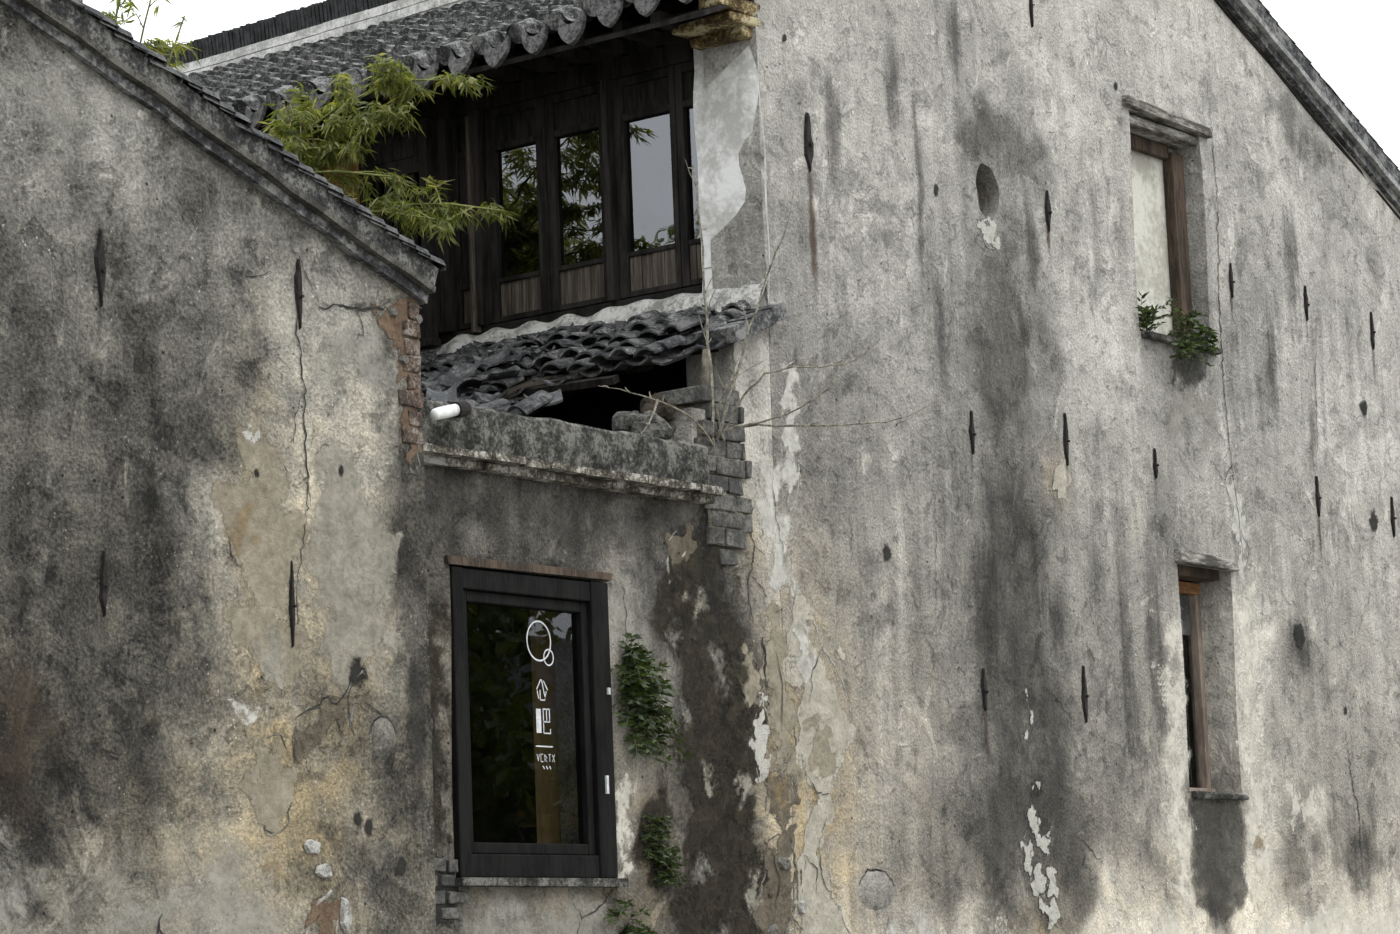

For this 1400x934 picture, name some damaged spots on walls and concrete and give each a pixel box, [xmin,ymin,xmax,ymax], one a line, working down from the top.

flaking render [977,216,1001,250]
crack [233,243,399,592]
flaking render [317,294,424,481]
flaking render [210,423,411,775]
flaking render [658,361,857,934]
damp [0,871,31,934]
damp [104,840,282,934]
spalling [303,839,353,934]
spalling [354,812,373,836]
flaking render [1020,781,1066,934]
damp [1150,562,1400,934]